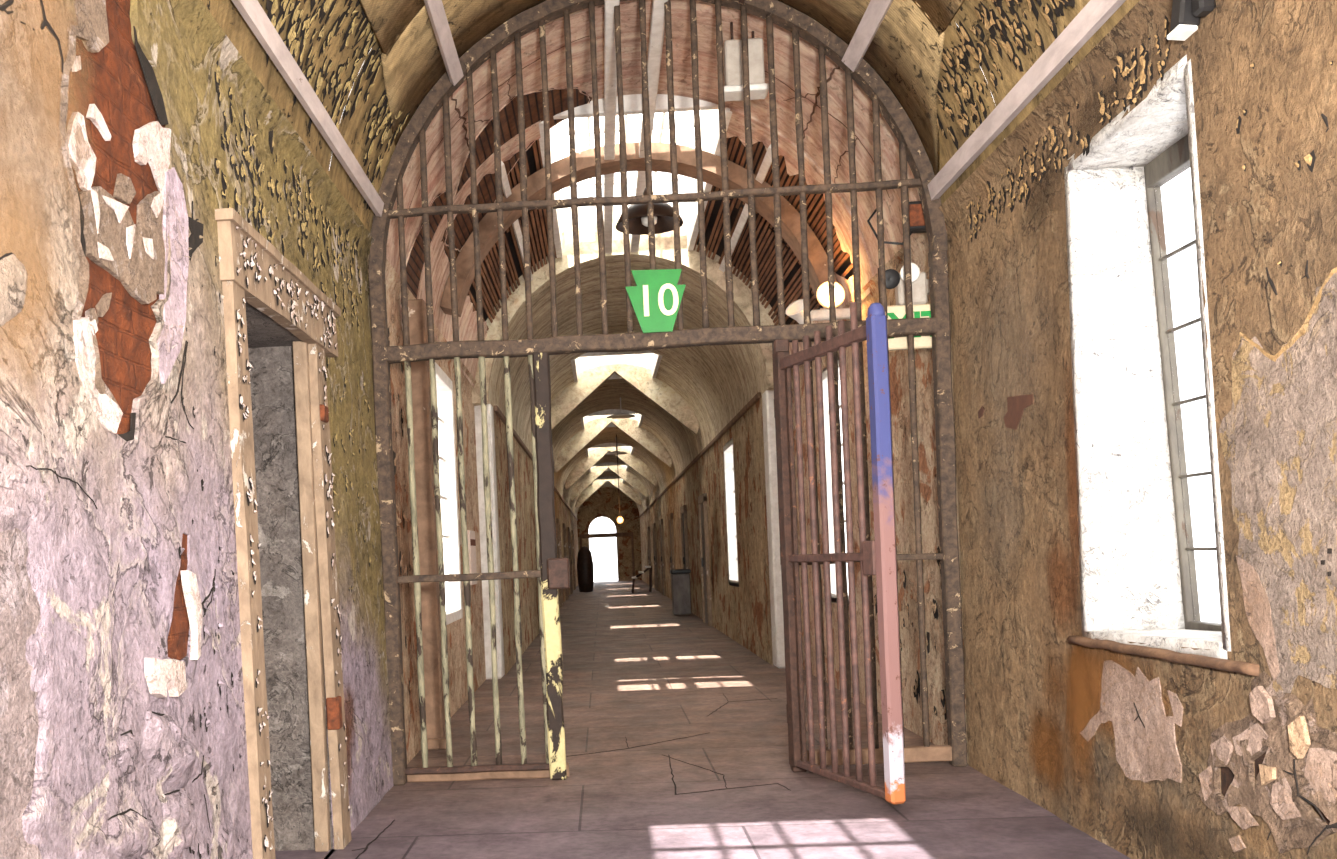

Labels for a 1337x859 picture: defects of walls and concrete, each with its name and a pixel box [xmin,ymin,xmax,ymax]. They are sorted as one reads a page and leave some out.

spalling [56,0,205,456]
peeling [260,0,410,210]
peeling [936,0,1075,150]
peeling [966,16,1170,243]
peeling [1294,150,1316,172]
spalling [144,519,223,698]
peeling [246,477,258,512]
peeling [250,534,261,598]
peeling [1199,267,1337,853]
peeling [1080,660,1184,783]
peeling [262,785,273,852]
crack [1283,759,1337,855]